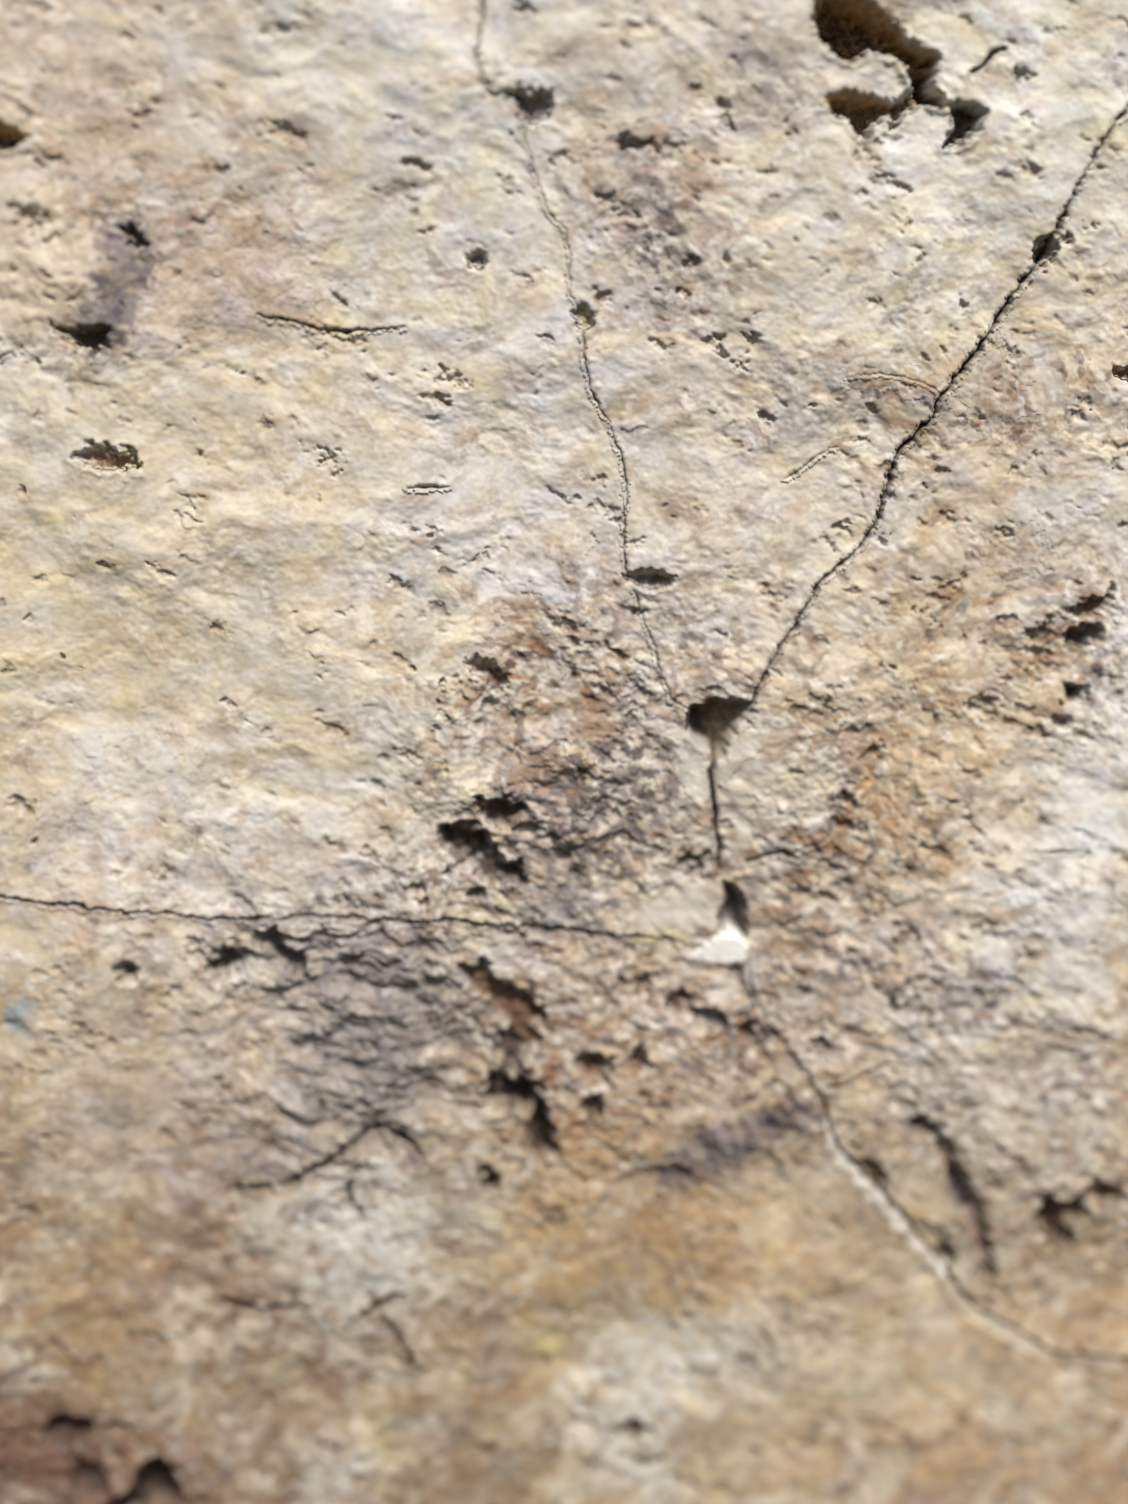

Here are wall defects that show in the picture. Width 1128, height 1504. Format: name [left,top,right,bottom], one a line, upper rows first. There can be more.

spalling [808,0,990,149]
crack [253,311,408,339]
crack [472,0,692,713]
crack [744,100,1128,709]
spalling [437,794,527,898]
peeling [666,697,764,809]
crack [675,741,838,874]
crack [0,894,707,952]
peeling [622,867,773,1035]
spalling [456,957,556,1161]
spalling [574,1043,651,1115]
crack [745,940,1128,1378]